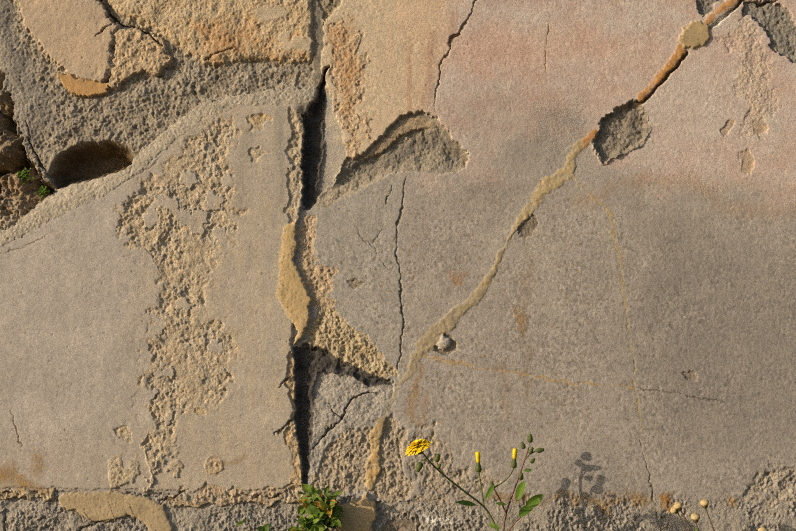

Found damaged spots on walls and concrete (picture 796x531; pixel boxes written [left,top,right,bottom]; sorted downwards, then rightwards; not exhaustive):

crack [435,0,477,102]
crack [636,44,689,108]
crack [704,0,777,30]
crack [302,69,328,210]
spalling [108,108,501,517]
crack [275,130,726,529]
crack [160,491,186,502]
spalling [742,464,796,514]